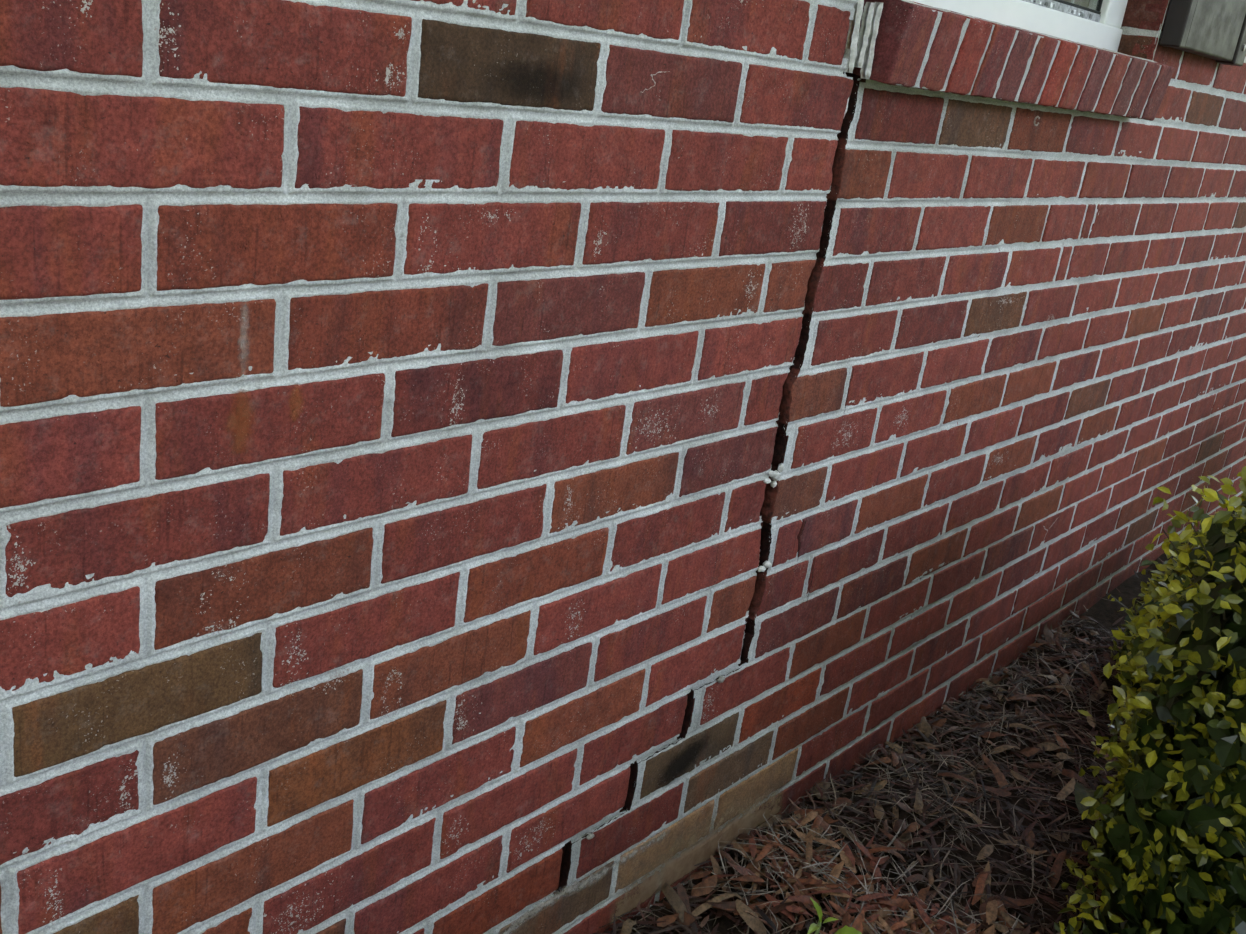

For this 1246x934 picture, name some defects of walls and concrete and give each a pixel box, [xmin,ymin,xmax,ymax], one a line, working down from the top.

crack [557,72,866,892]